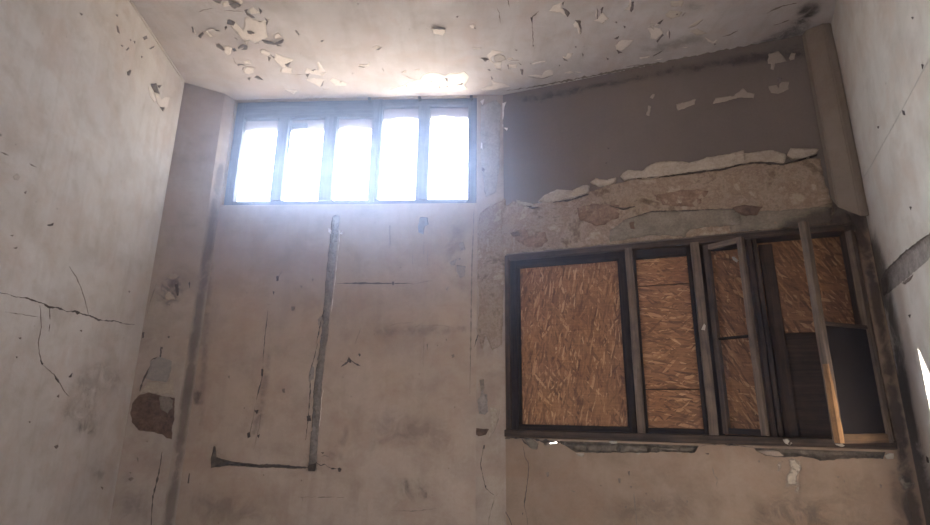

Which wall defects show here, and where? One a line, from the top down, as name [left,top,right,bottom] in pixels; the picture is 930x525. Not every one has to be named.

peeling [191,0,347,91]
peeling [549,2,582,34]
peeling [148,83,169,111]
peeling [390,69,469,92]
spalling [477,46,834,350]
crack [2,266,135,395]
crack [247,270,283,450]
spalling [130,379,175,442]
crack [480,437,570,525]
spalling [560,440,698,457]
spalling [755,439,894,462]